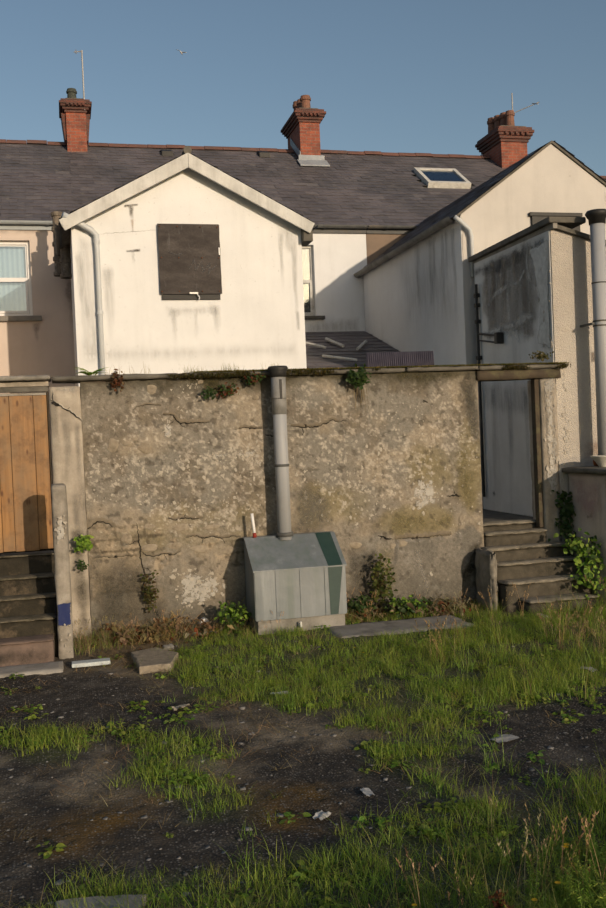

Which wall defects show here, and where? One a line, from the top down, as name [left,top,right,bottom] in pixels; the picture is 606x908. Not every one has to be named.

water stain [484,246,534,335]
crack [51,395,82,420]
crack [133,402,211,427]
crack [234,417,344,437]
crack [87,514,241,593]